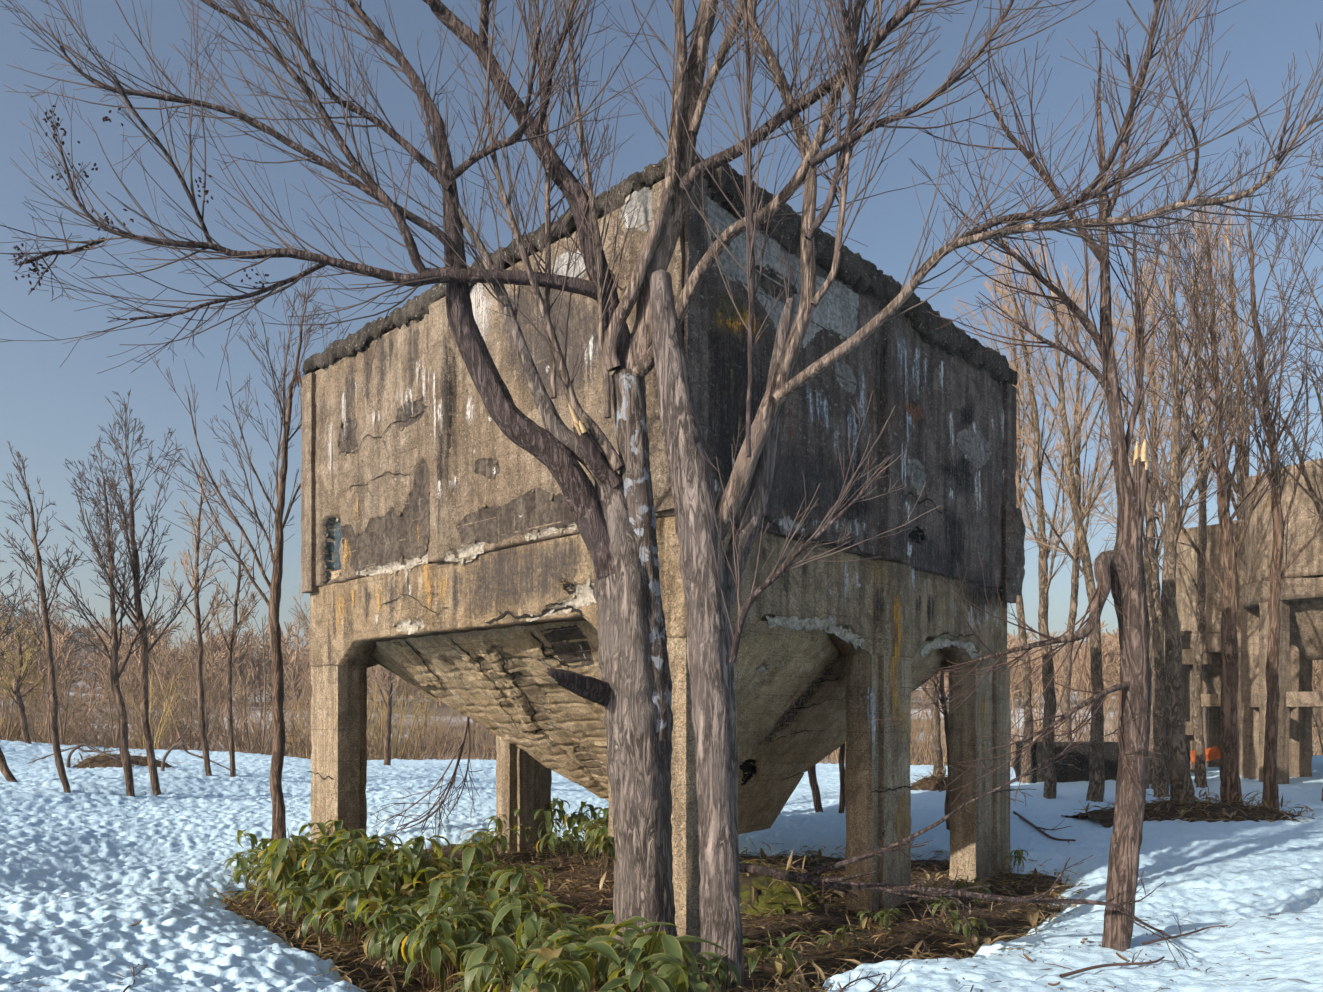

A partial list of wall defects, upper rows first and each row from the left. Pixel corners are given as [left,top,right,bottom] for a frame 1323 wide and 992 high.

peeling [707,196,859,349]
leakage [950,405,976,444]
leakage [365,571,411,623]
crack [381,592,584,734]
peeling [391,578,596,732]
leakage [452,536,579,615]
spalling [766,615,865,650]
spalling [920,637,981,659]
leakage [907,457,1009,629]